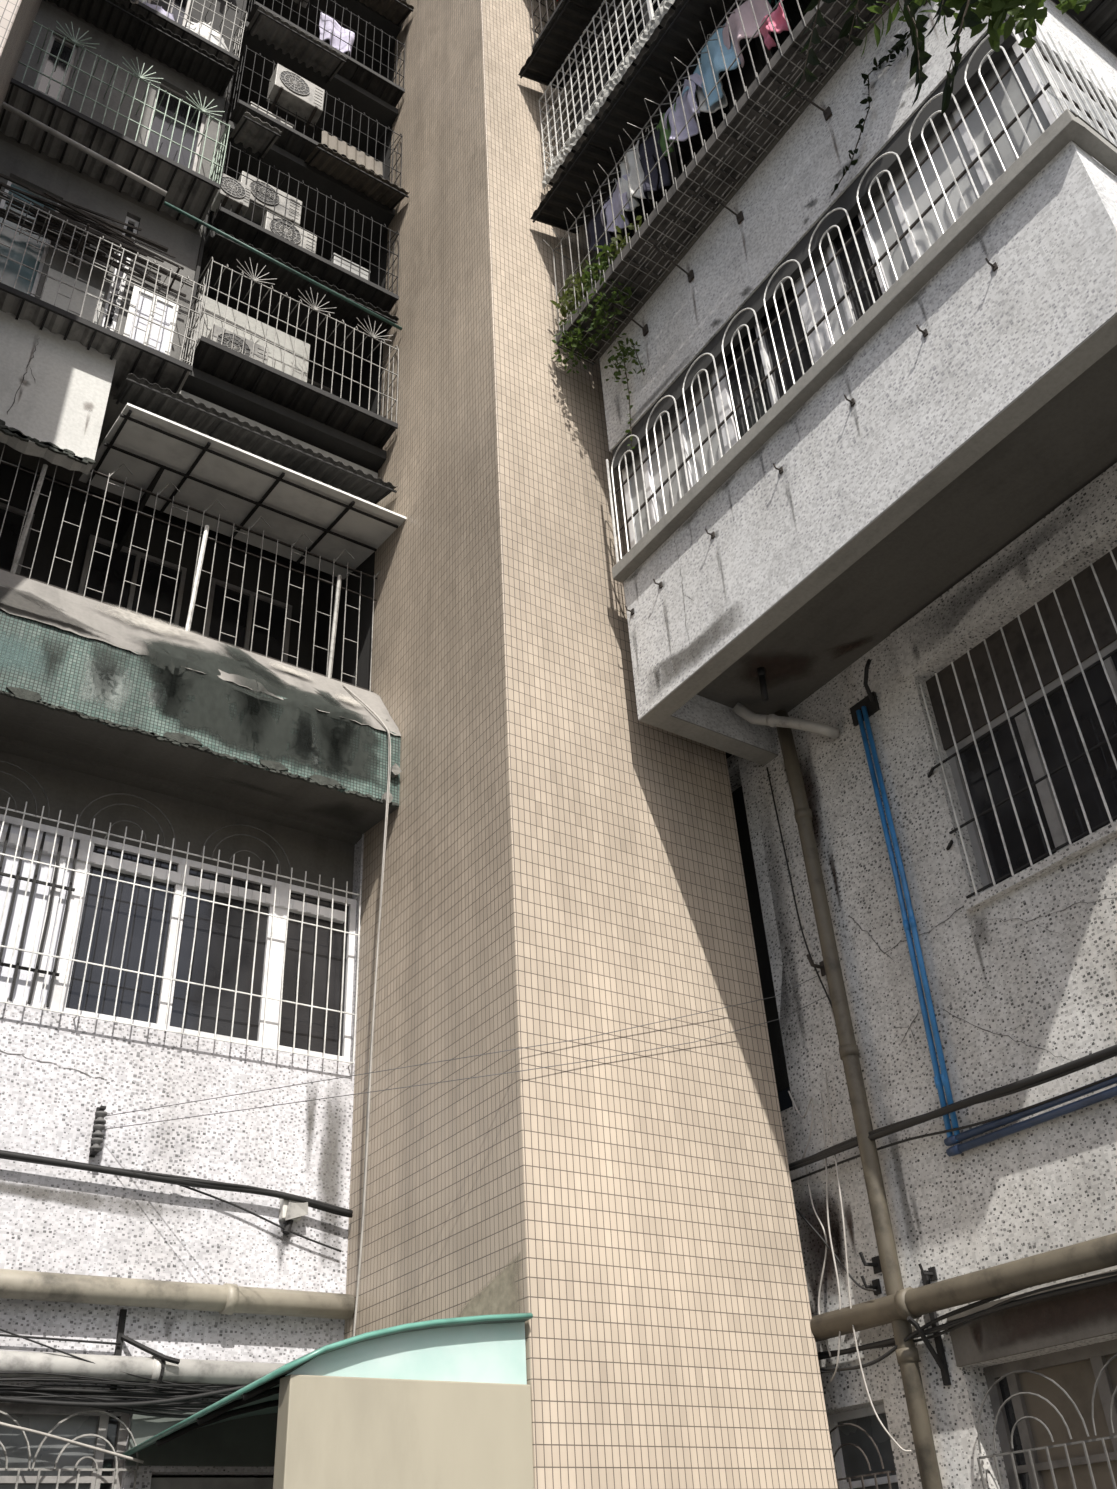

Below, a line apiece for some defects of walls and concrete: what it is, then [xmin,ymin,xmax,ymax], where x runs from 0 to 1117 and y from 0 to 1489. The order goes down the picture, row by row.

crack [7,344,38,414]
leakage [655,624,720,683]
leakage [240,670,270,727]
leakage [316,689,341,706]
leakage [295,722,347,766]
leakage [802,1199,854,1297]